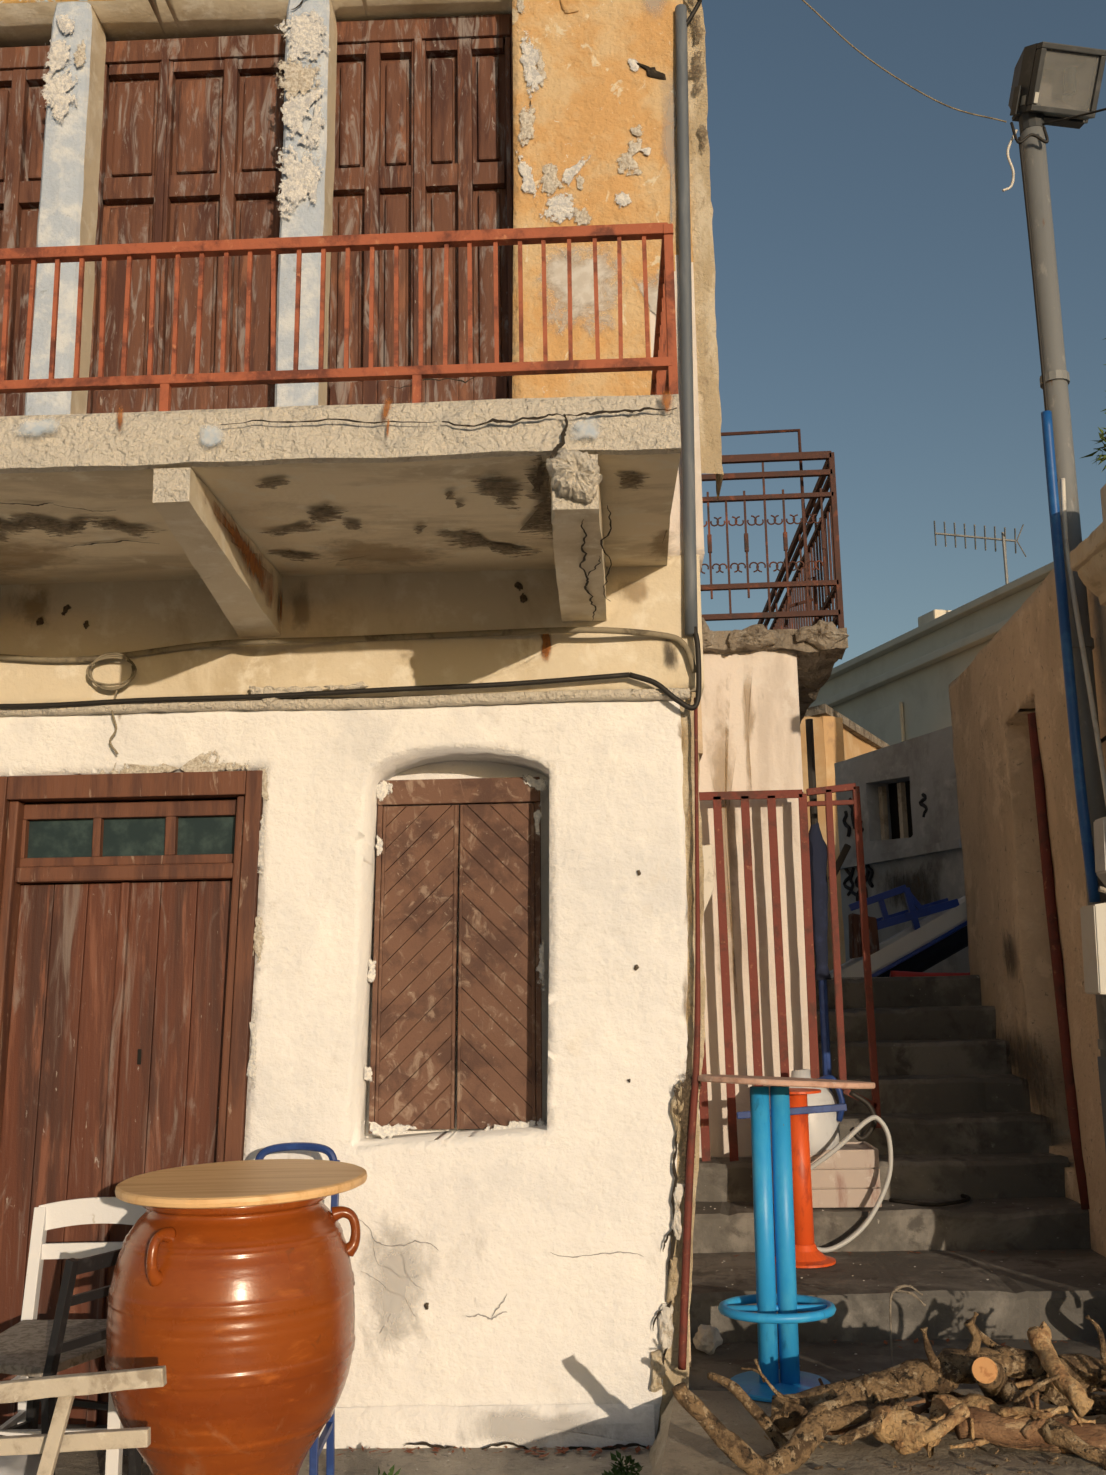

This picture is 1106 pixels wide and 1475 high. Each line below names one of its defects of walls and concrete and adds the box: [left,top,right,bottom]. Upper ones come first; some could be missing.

peeling [41,14,86,124]
peeling [276,10,331,220]
peeling [515,0,592,226]
peeling [614,124,651,208]
peeling [628,58,666,80]
crack [221,377,677,459]
rust [217,508,282,621]
crack [579,505,612,621]